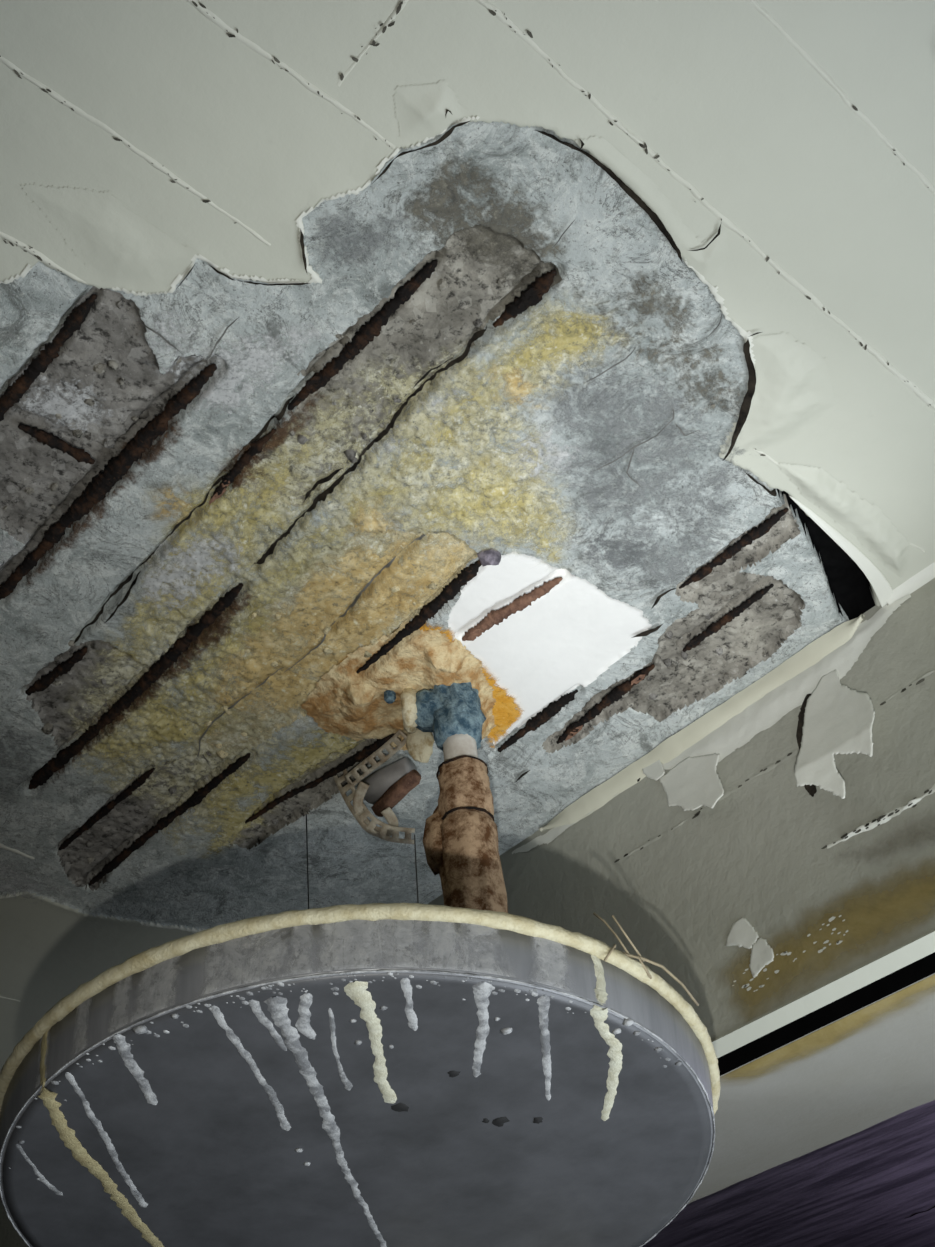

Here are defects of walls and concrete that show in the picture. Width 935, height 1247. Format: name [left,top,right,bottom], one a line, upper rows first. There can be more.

crack [373,109,470,183]
leakage [321,160,563,286]
crack [534,130,721,263]
corrosion [224,394,319,488]
crack [74,475,224,643]
corrosion [214,509,462,719]
leakage [70,275,740,854]
peeling [0,115,911,934]
corrosion [482,668,522,748]
peeling [726,917,774,978]
leakage [728,866,935,1014]
leakage [722,975,935,1079]